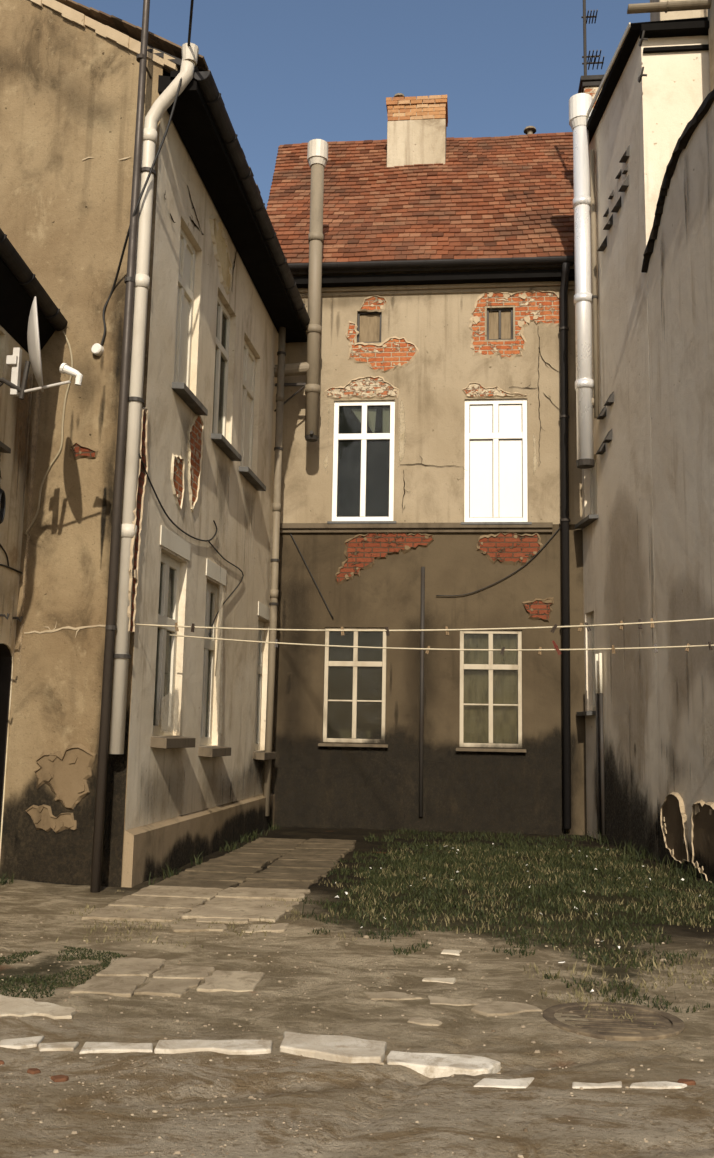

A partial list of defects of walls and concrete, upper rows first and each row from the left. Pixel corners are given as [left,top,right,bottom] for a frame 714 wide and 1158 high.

flaking render [325,295,419,400]
flaking render [469,291,560,361]
flaking render [25,743,98,834]
water stain [595,746,714,883]
flaking render [660,792,714,883]